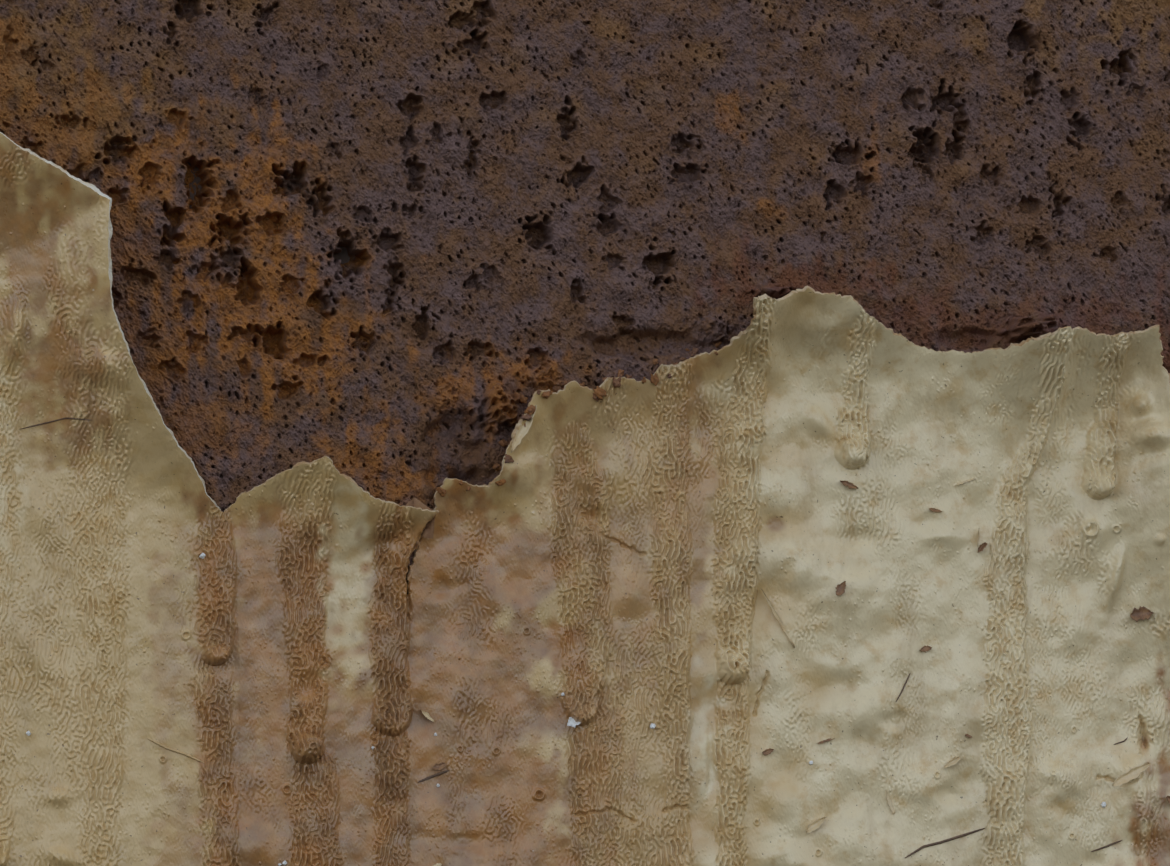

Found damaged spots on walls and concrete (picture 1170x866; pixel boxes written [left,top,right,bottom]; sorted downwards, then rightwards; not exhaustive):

spalling [444,1,497,57]
spalling [272,87,444,322]
spalling [560,156,623,237]
rust [714,91,751,143]
spalling [823,140,878,211]
rust [859,94,890,183]
spalling [901,80,971,186]
rust [694,224,1170,373]
peeling [0,131,442,866]
rust [0,0,576,866]
peeling [440,286,1170,866]
rust [1111,647,1170,866]